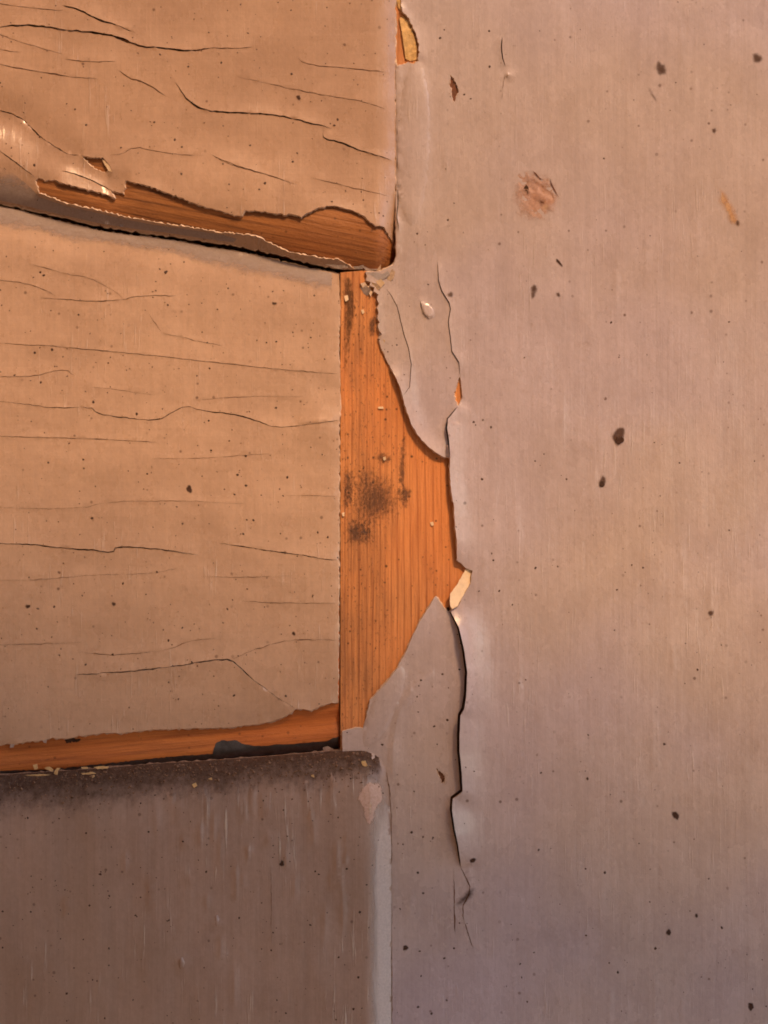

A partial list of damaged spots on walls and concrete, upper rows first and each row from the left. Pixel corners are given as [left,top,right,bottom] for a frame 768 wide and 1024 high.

crack [0,4,387,159]
peeling [395,0,419,65]
crack [0,110,108,189]
peeling [520,171,557,212]
crack [1,265,333,377]
crack [387,262,460,393]
crack [3,387,333,459]
peeling [0,179,472,774]
water stain [346,439,411,541]
crack [0,543,195,580]
peeling [358,782,383,824]
crack [447,607,472,945]